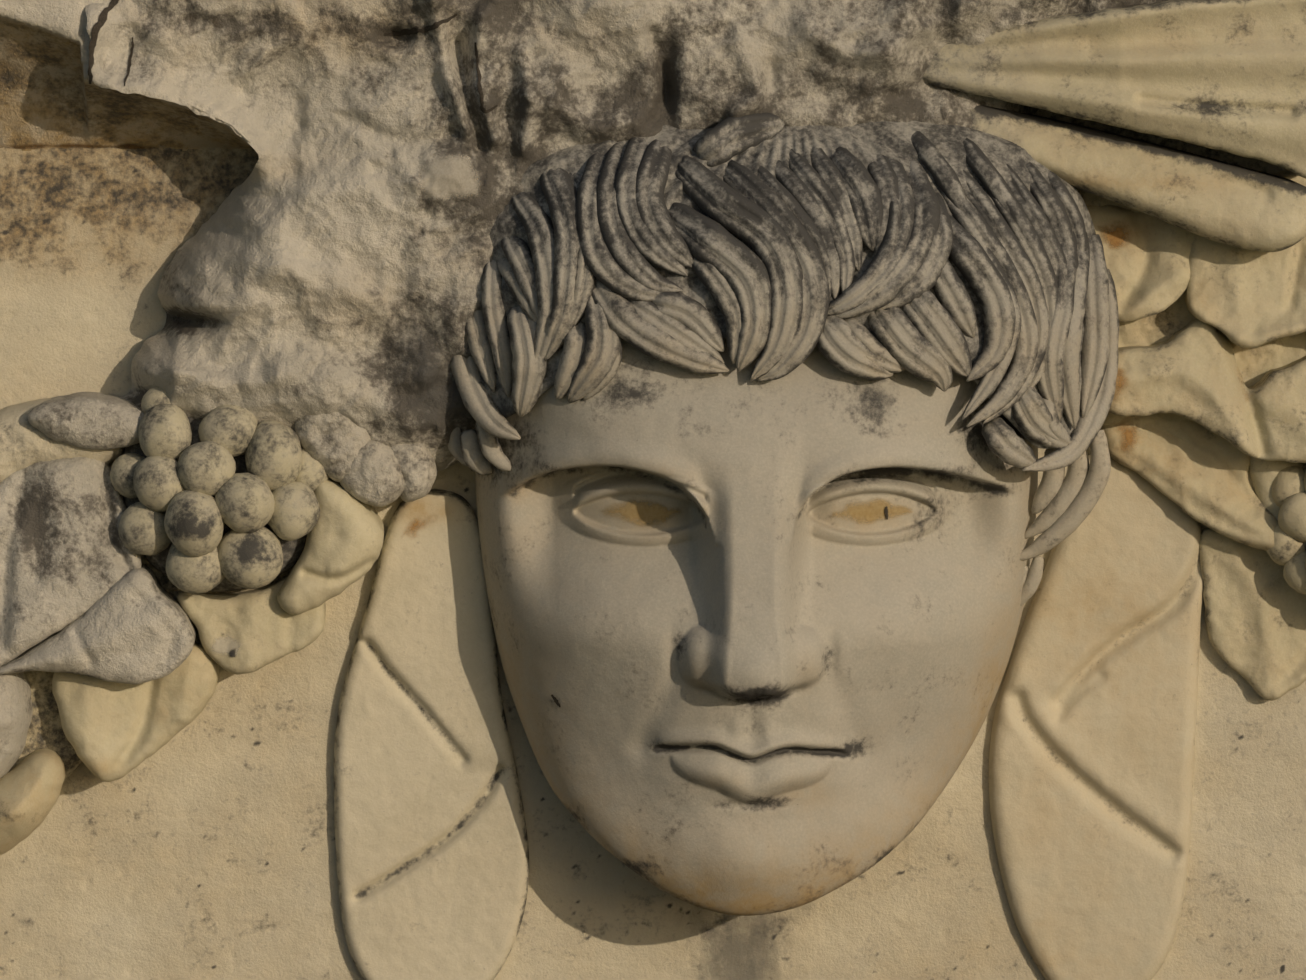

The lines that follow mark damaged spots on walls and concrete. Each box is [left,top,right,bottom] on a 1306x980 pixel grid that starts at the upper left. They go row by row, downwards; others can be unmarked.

crack [88,0,134,86]